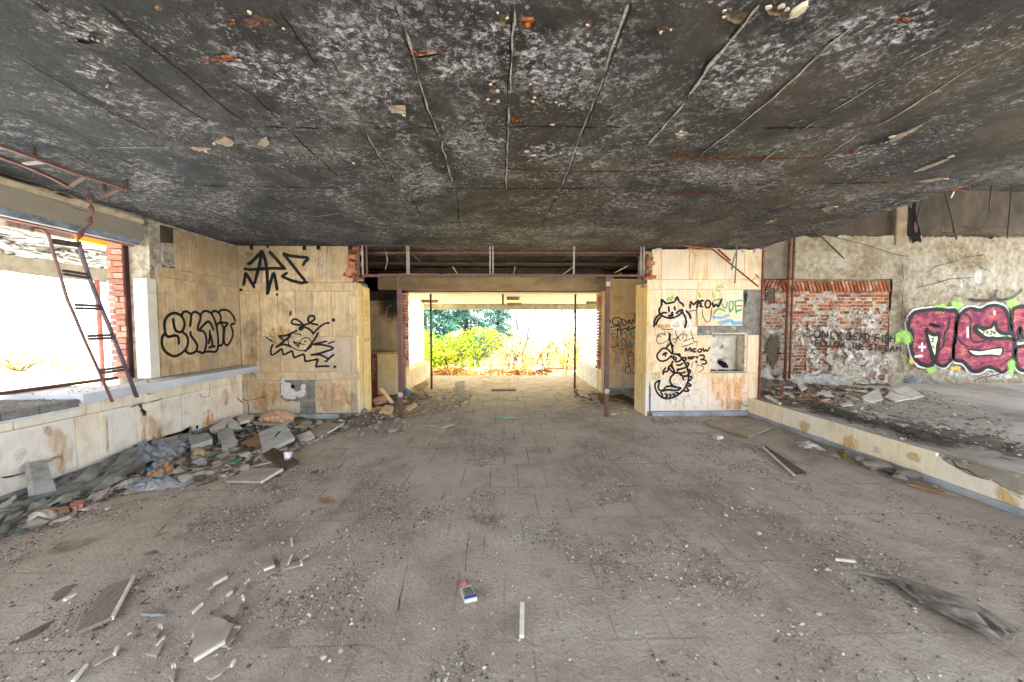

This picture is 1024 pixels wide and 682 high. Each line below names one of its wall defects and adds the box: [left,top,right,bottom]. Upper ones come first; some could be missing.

spalling [722,9,751,24]
spalling [410,50,442,59]
peeling [388,105,406,117]
spalling [826,358,867,384]
spalling [280,380,316,413]
crack [942,457,1022,499]